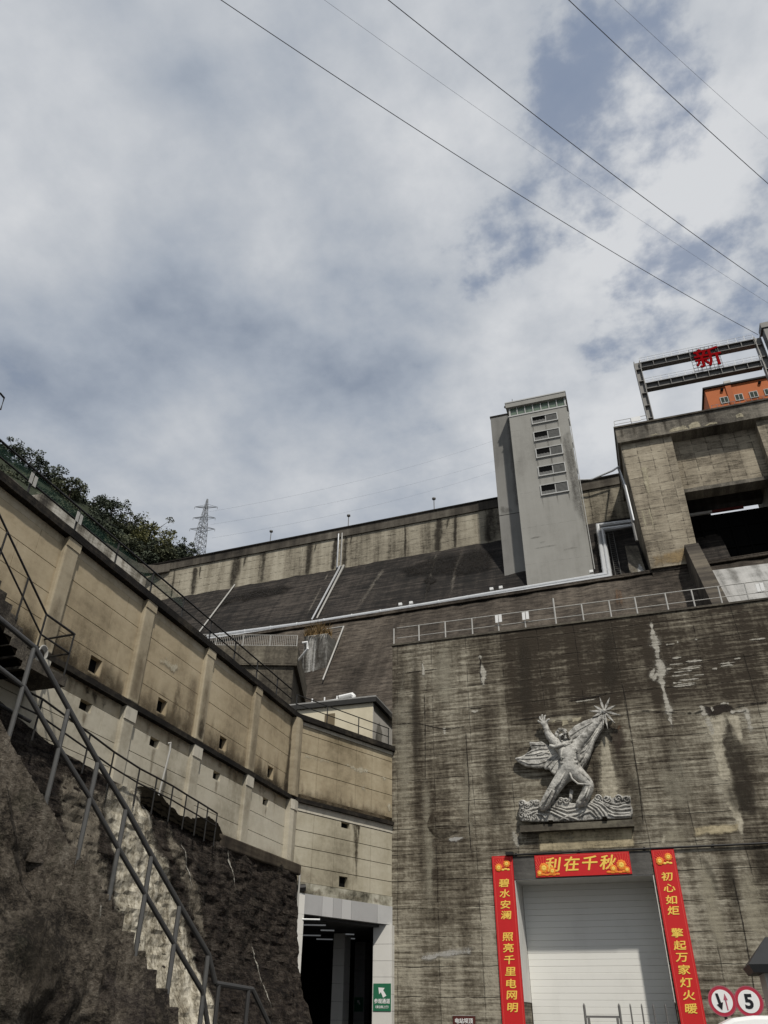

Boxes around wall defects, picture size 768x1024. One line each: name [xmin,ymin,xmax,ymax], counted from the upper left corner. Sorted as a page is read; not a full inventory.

efflorescence [650,624,673,724]
spalling [700,702,749,716]
damp [704,712,757,834]
damp [324,801,384,866]